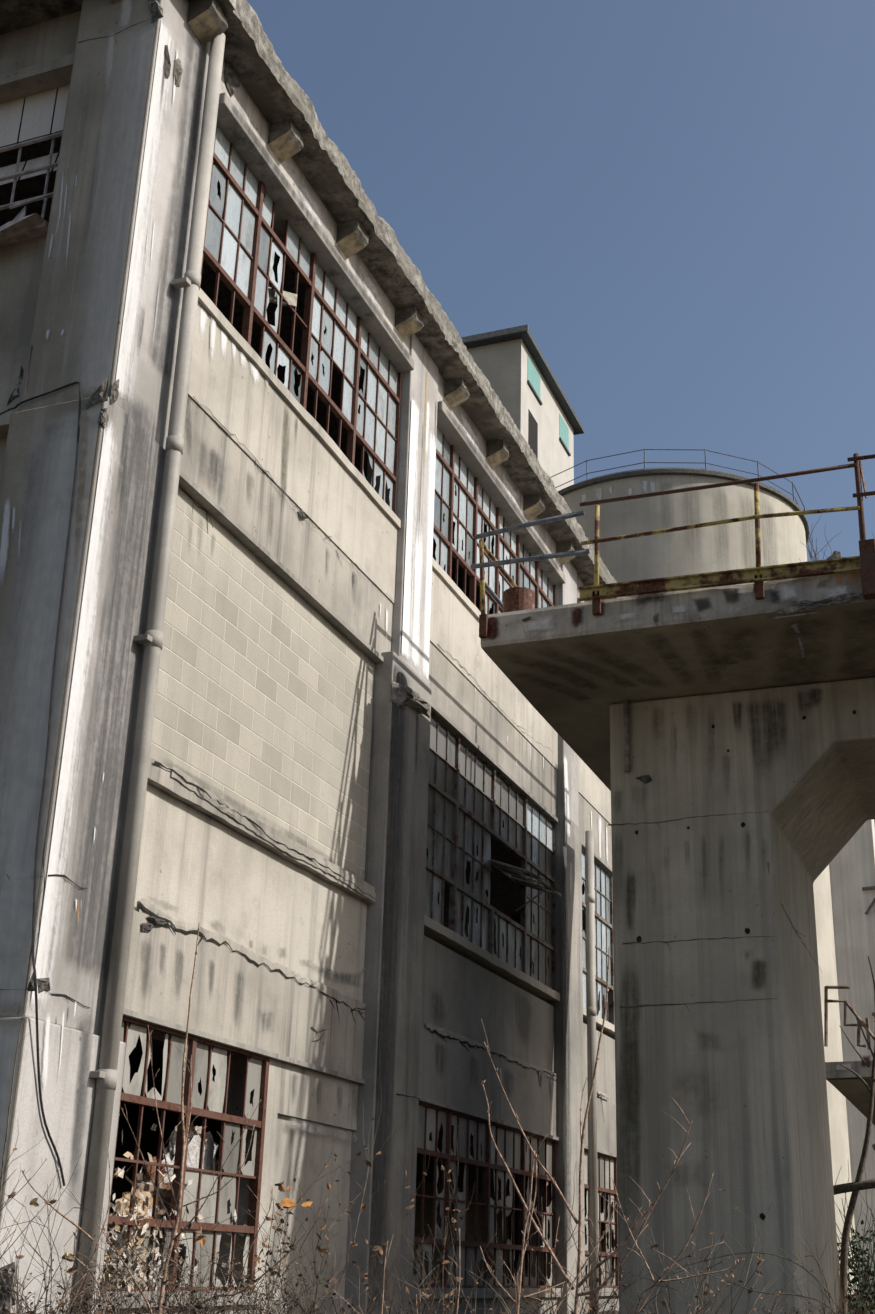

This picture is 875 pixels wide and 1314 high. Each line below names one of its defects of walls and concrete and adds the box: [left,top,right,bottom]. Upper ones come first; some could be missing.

leakage [0,0,201,1004]
crack [154,761,376,902]
crack [139,898,366,1023]
leakage [42,1002,92,1178]
crack [426,1022,557,1086]